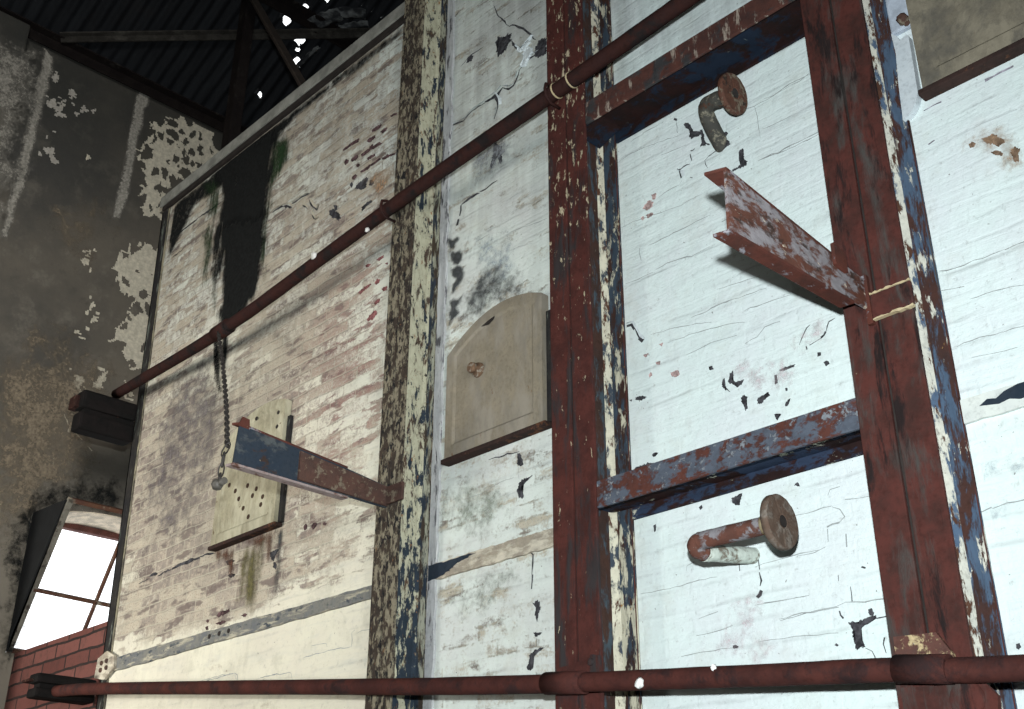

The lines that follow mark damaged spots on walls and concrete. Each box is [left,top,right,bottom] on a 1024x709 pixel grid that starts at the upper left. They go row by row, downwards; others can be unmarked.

crack [452,6,538,125]
flaking render [2,49,96,237]
peeling [113,92,219,220]
spalling [343,113,397,190]
corrosion [969,134,1020,162]
leakage [203,128,289,321]
peeling [74,296,100,340]
peeling [108,242,158,401]
flaking render [358,279,387,321]
leakage [468,260,519,313]
spalling [517,453,532,499]
spalling [848,608,877,650]